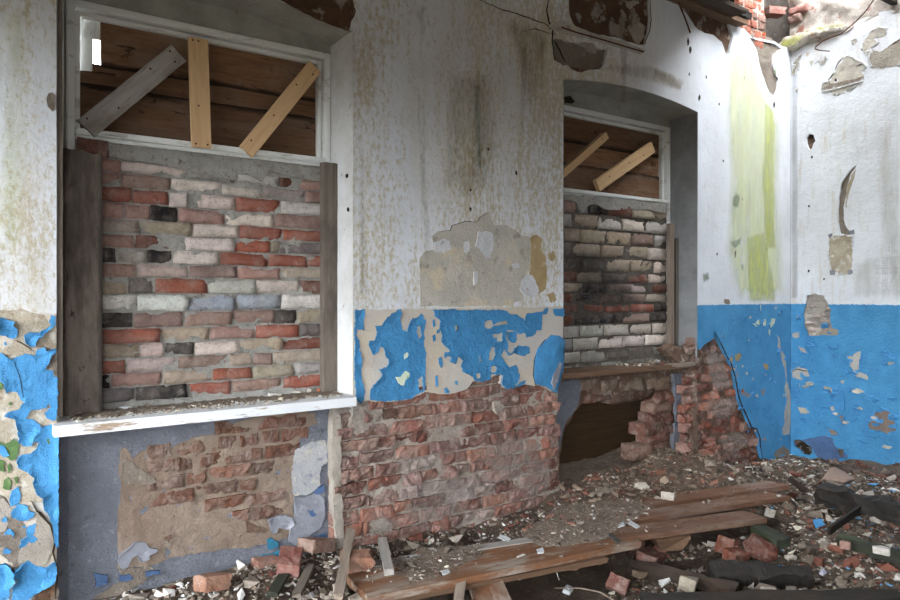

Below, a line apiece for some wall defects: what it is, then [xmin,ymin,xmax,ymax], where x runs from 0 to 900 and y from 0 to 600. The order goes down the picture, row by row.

flaking render [281,0,356,31]
crack [481,0,565,62]
flaking render [553,0,648,73]
spalling [735,0,900,96]
peeling [827,166,856,275]
peeling [0,308,60,600]
flaking render [93,212,565,599]
flaking render [580,294,900,482]
crack [715,332,765,460]